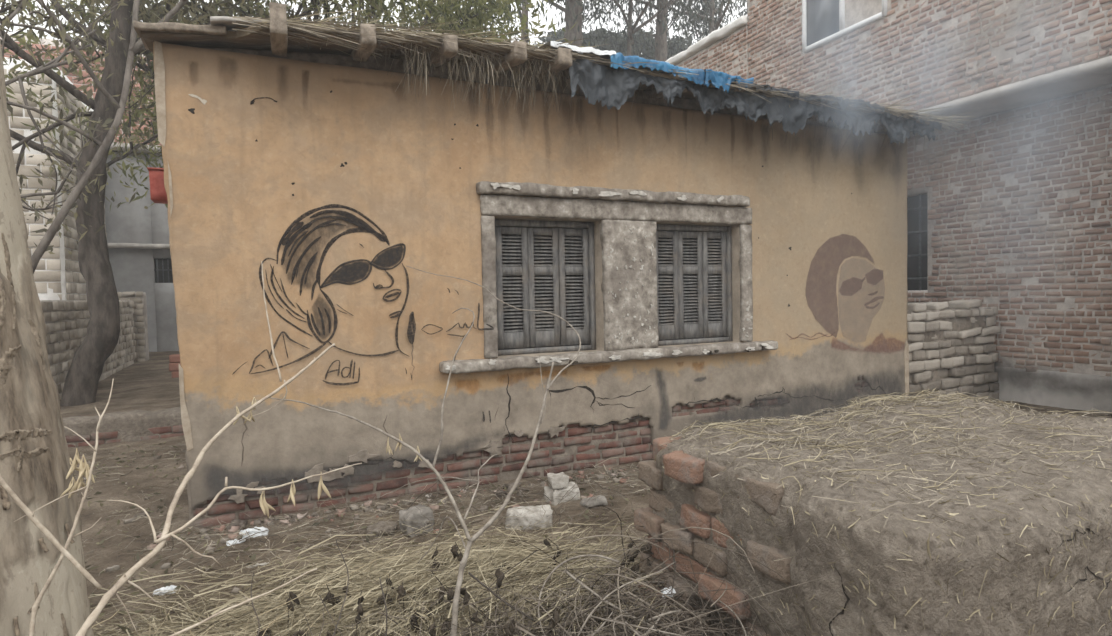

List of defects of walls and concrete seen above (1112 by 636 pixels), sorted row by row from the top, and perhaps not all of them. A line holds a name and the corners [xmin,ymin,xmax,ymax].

peeling [154,40,166,147]
spalling [490,182,521,190]
spalling [742,304,774,352]
spalling [535,357,578,365]
crack [491,376,514,442]
crack [549,385,651,428]
spalling [179,364,653,528]
crack [1059,528,1095,549]
crack [829,564,850,636]
crack [1066,566,1112,593]